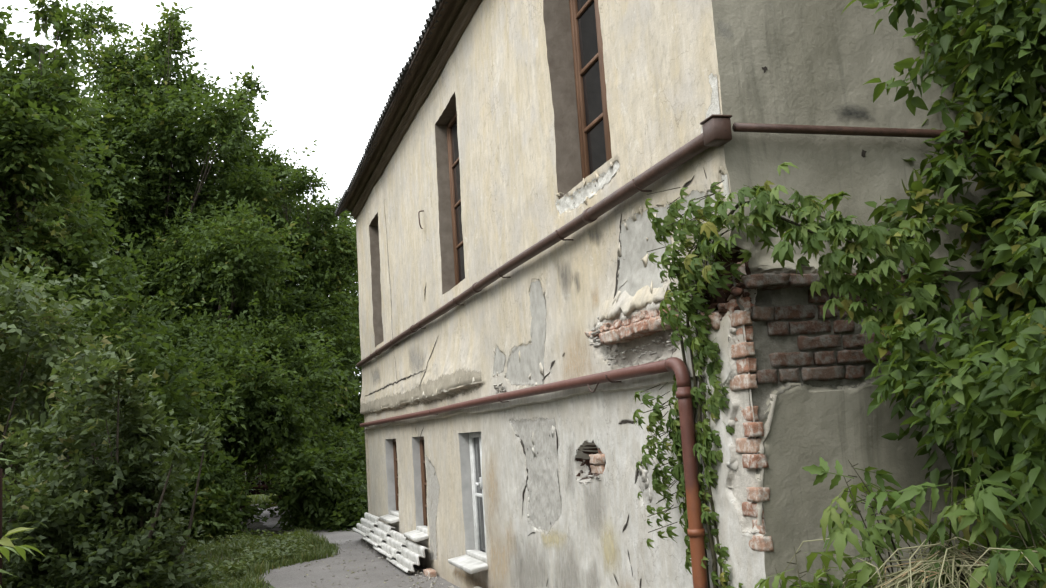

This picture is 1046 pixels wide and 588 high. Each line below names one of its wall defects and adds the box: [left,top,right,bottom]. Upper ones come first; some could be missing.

flaking render [555,159,621,217]
spalling [584,166,730,368]
peeling [492,277,547,388]
hole [575,440,606,484]
spalling [700,261,916,552]
crack [613,513,641,588]